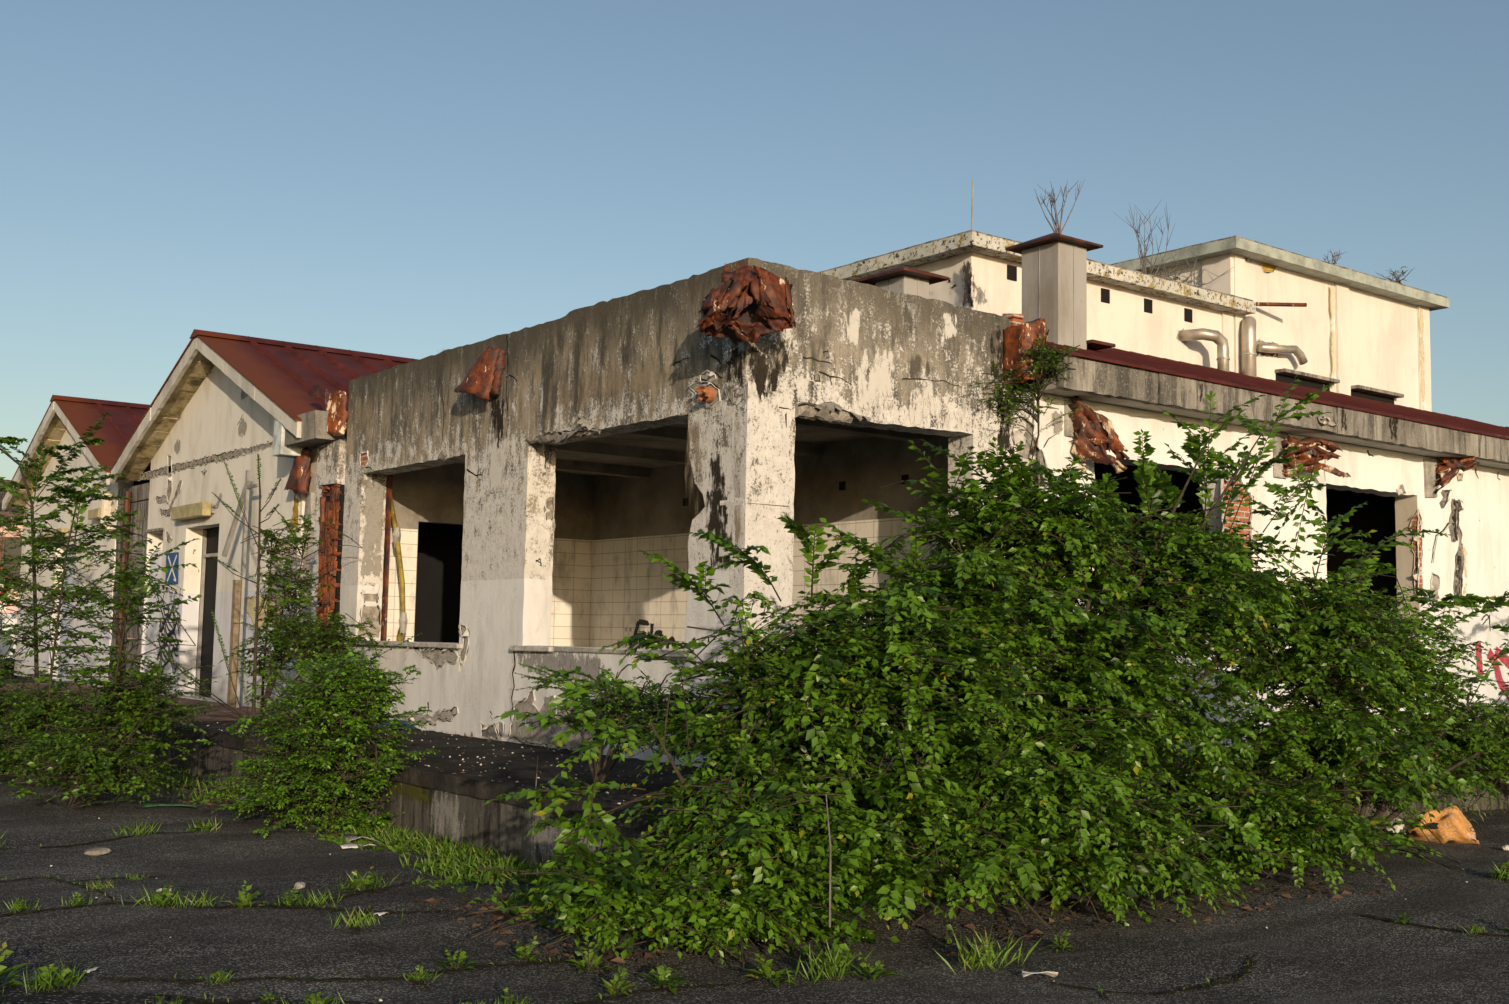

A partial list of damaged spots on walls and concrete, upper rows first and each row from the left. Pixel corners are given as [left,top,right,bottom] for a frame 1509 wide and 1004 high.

water stain [943,261,987,339]
water stain [723,340,793,404]
water stain [844,308,937,426]
rust [307,385,348,436]
water stain [689,423,732,570]
flaking render [1221,474,1254,569]
flaking render [407,623,470,672]
flaking render [401,705,459,726]
flaking render [479,690,604,754]
crack [0,832,447,934]
crack [100,951,628,1004]
crack [1049,954,1257,1000]